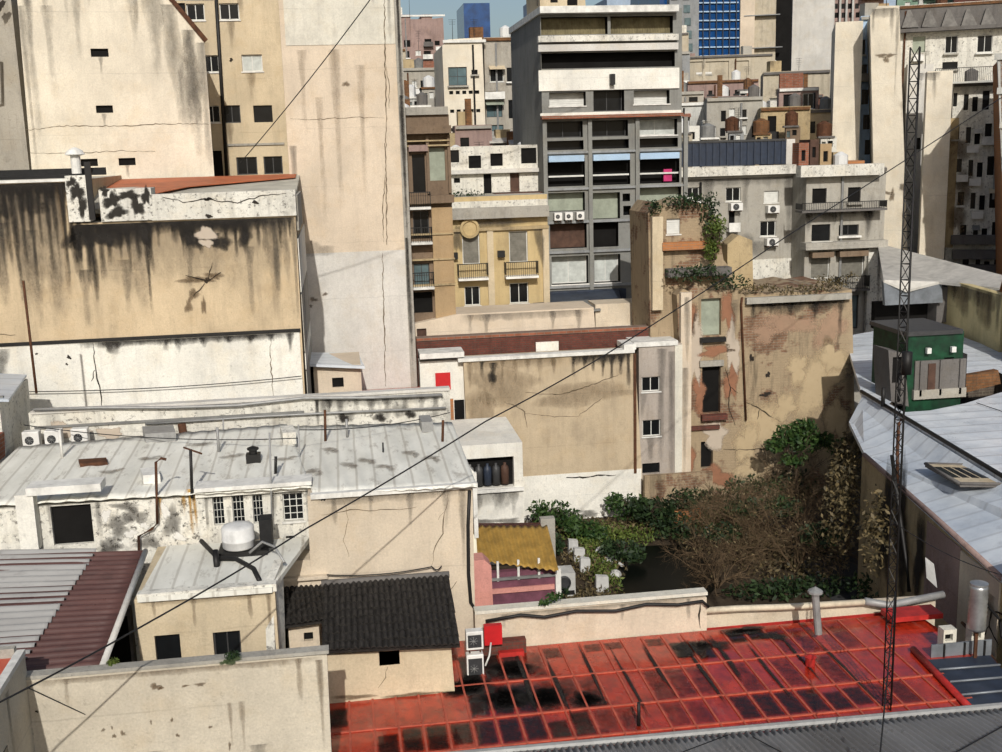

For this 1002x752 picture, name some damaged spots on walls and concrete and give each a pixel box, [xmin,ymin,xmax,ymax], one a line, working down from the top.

damp [396,0,406,201]
damp [0,177,290,290]
spalling [194,214,217,248]
crack [301,0,390,386]
spalling [691,292,740,413]
peeling [772,355,807,423]
spalling [754,310,847,373]
peeling [822,397,850,439]
damp [877,465,924,597]
damp [330,695,369,727]
damp [378,642,646,752]
damp [644,626,919,718]